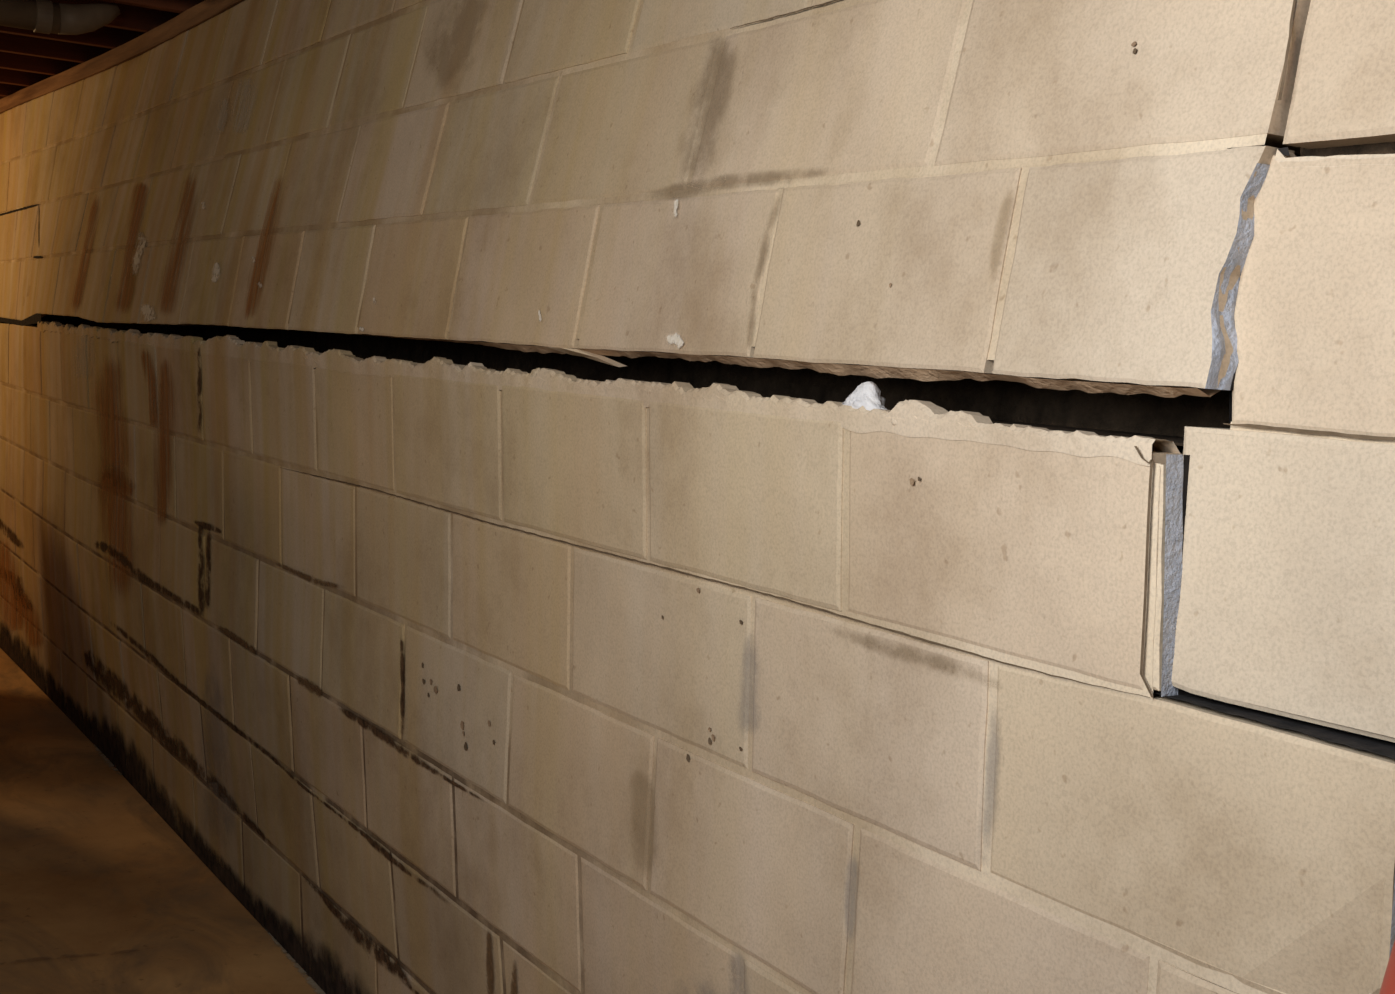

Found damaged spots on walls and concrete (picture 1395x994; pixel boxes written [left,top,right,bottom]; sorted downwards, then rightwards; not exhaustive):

crack [1278,0,1296,100]
rust [246,184,280,314]
crack [0,142,1395,759]
damp [0,519,21,546]
damp [96,521,221,614]
damp [276,563,337,587]
damp [0,624,361,994]
damp [117,626,438,894]
damp [341,640,479,798]
damp [309,882,419,994]
crack [1387,877,1395,958]